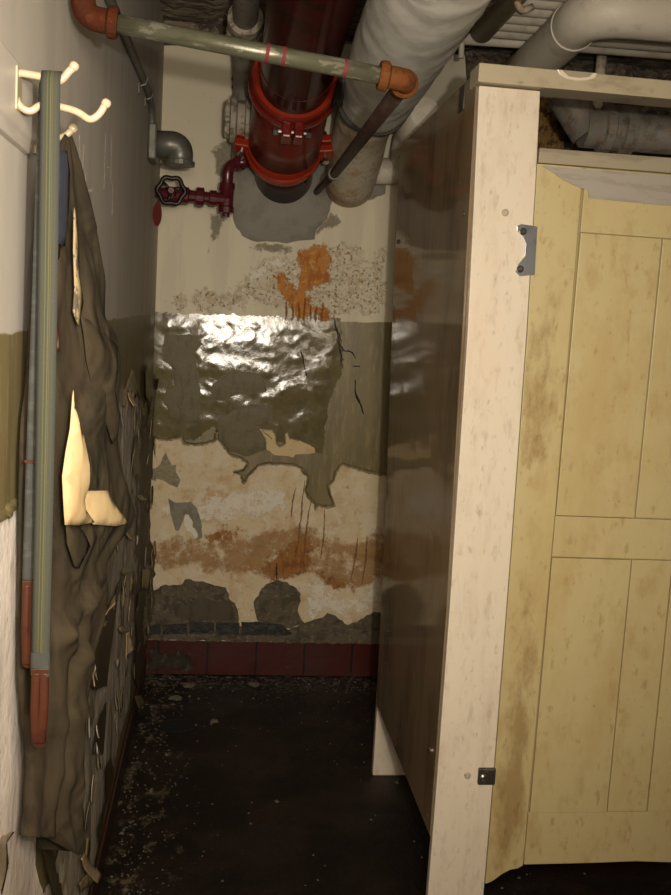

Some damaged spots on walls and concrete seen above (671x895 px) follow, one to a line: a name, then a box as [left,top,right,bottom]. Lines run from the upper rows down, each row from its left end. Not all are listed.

peeling [171,242,388,319]
rust [273,244,333,322]
crack [333,317,364,414]
peeling [0,359,387,895]